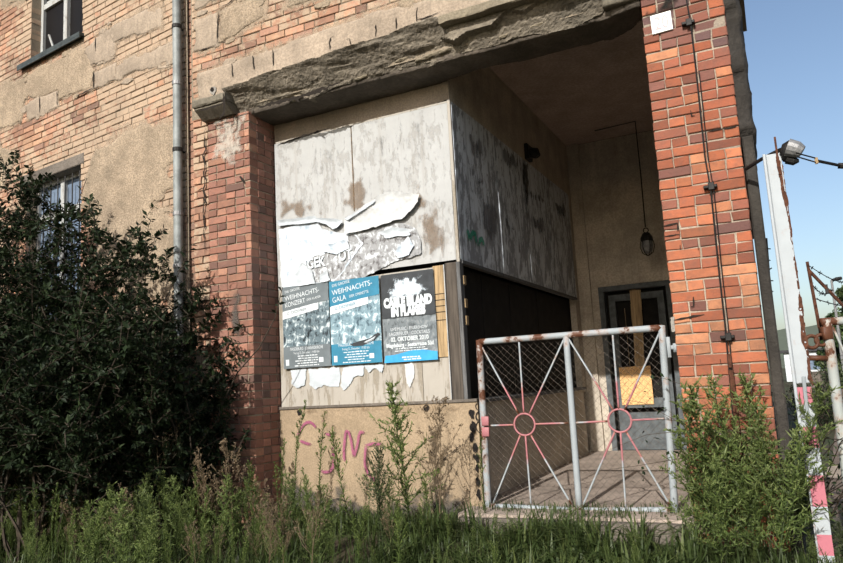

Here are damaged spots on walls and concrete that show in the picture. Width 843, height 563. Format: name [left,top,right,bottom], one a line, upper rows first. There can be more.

peeling [0,5,165,129]
spalling [193,0,605,113]
peeling [0,141,16,191]